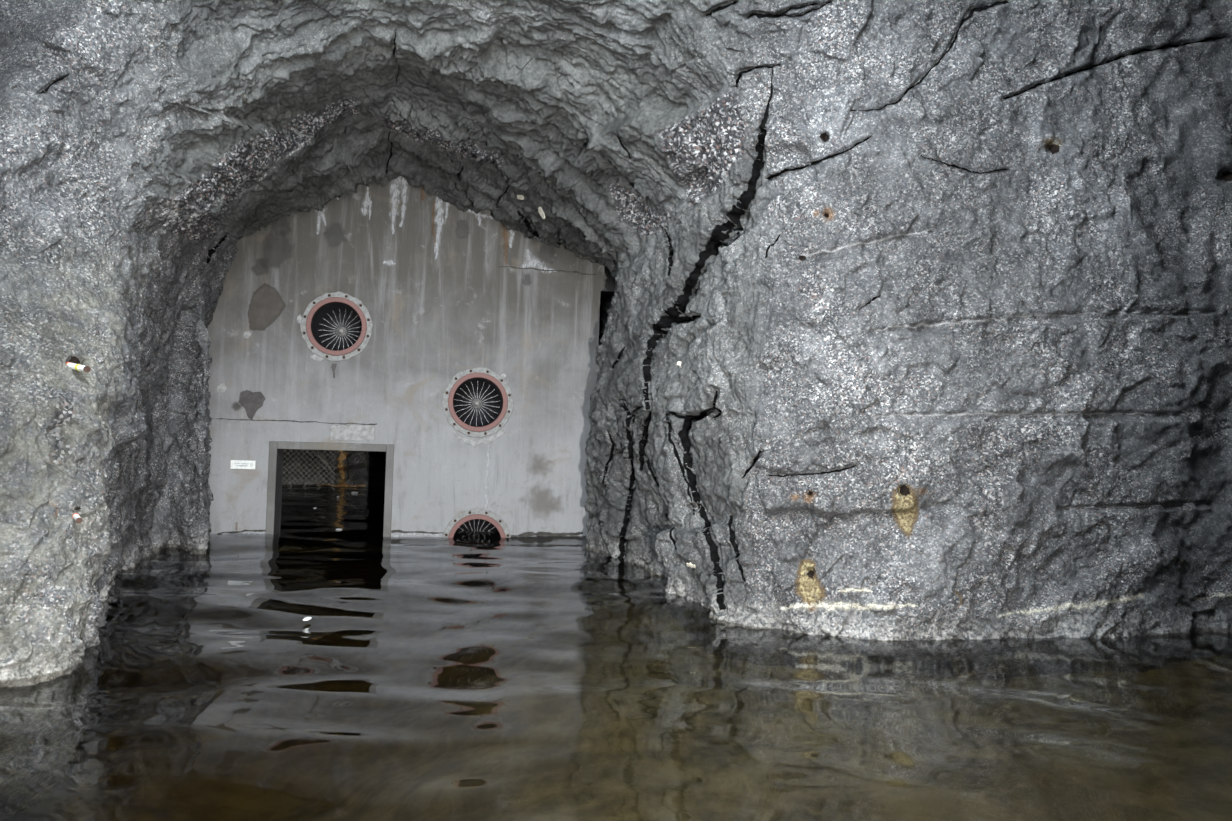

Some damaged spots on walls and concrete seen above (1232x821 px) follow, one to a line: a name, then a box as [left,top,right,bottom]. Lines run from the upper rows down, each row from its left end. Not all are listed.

leakage [317,210,345,245]
efflorescence [390,176,407,234]
leakage [434,196,494,259]
leakage [523,245,556,284]
crack [602,0,1009,610]
leakage [233,390,265,420]
rust [891,485,919,536]
rust [796,559,826,606]